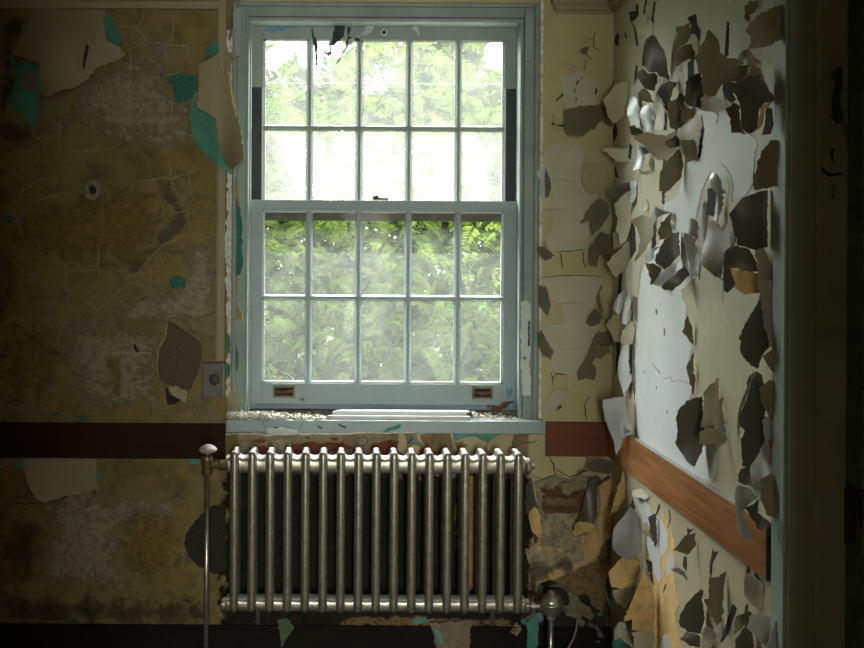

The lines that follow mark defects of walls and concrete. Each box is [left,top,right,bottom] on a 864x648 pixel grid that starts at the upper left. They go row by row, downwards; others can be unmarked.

peeling [9,9,126,127]
water stain [4,57,191,154]
peeling [311,26,374,67]
peeling [167,6,246,412]
crack [65,164,211,374]
peeling [520,0,782,539]
flaking render [133,321,202,417]
peeling [0,458,102,503]
peeling [225,421,537,455]
peeling [341,470,776,648]
peeling [277,618,295,648]